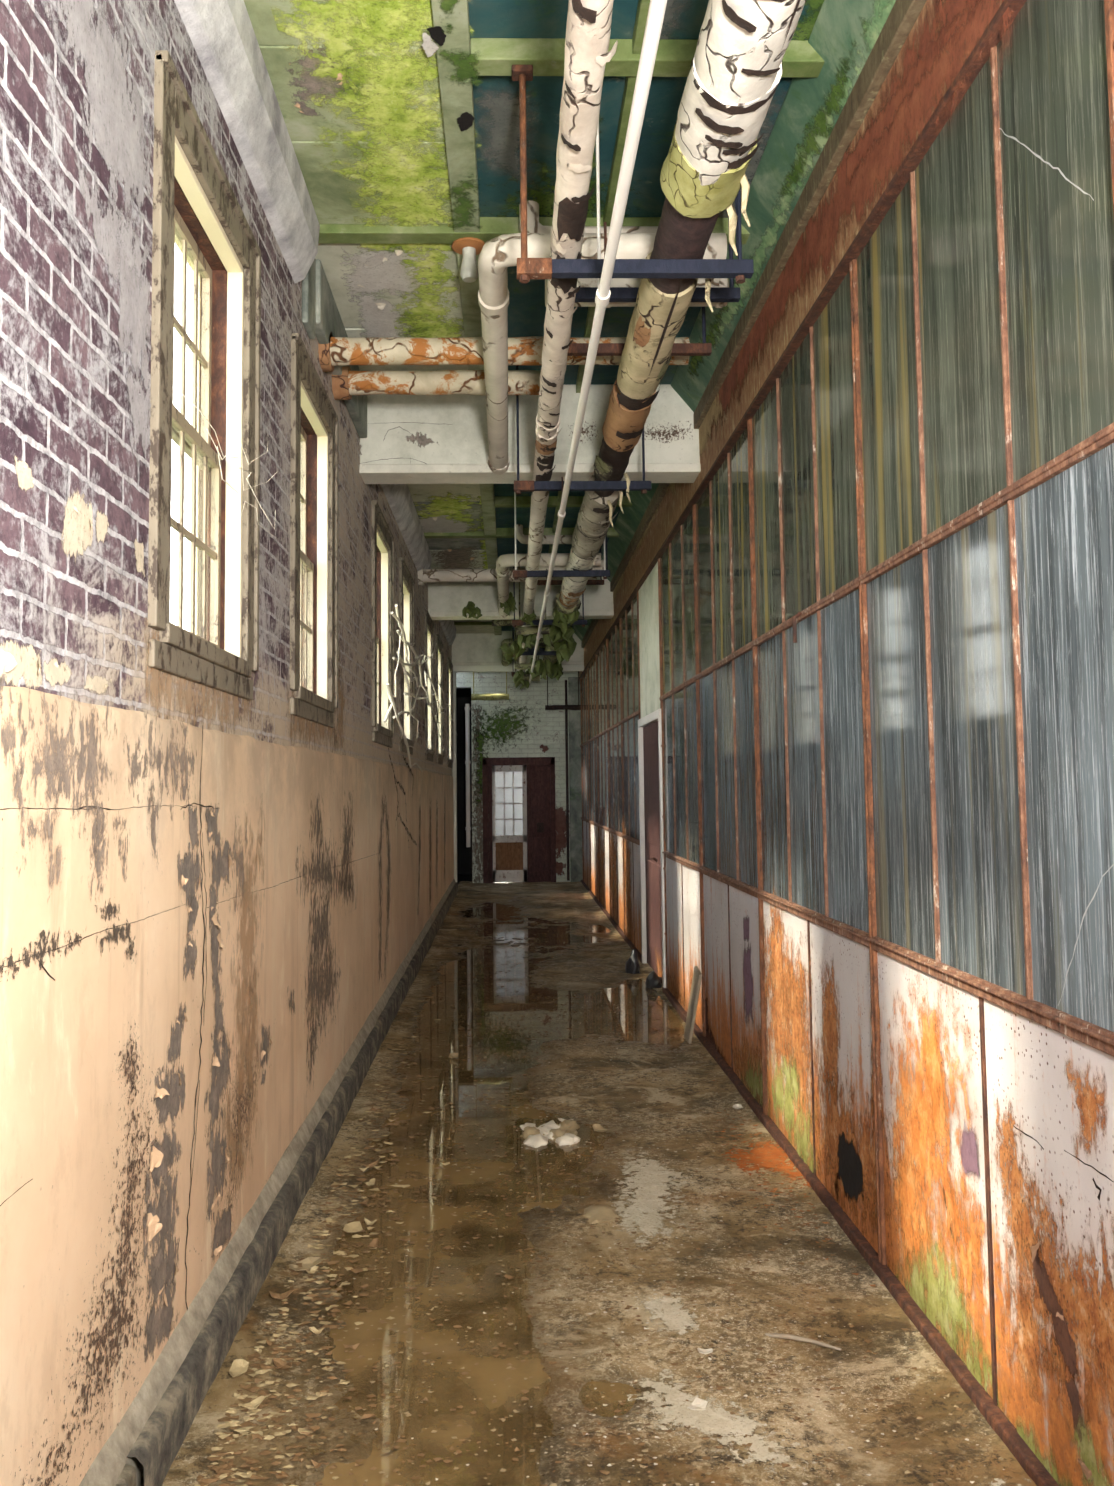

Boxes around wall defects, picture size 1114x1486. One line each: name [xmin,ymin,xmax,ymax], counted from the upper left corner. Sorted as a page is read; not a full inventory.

leakage [332,0,535,179]
leakage [660,0,686,39]
corrosion [708,0,1014,437]
peeling [14,456,34,491]
peeling [61,489,109,562]
peeling [134,539,145,577]
peeling [0,640,112,695]
leakage [0,631,251,982]
leakage [224,829,262,1202]
leakage [287,792,357,1085]
corrosion [655,952,723,1058]
corrosion [722,890,1114,1440]